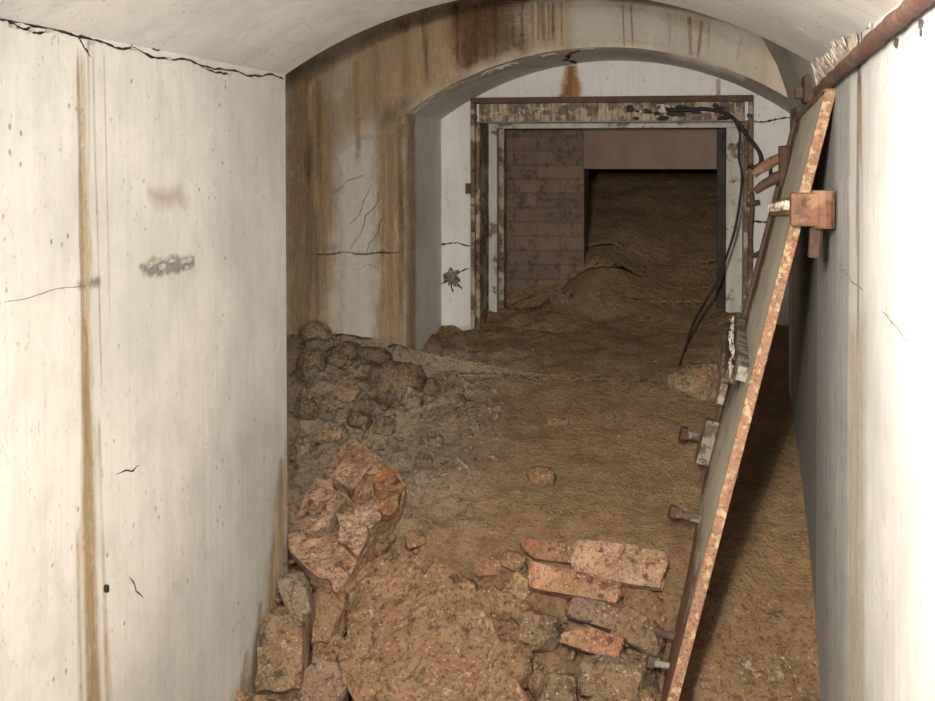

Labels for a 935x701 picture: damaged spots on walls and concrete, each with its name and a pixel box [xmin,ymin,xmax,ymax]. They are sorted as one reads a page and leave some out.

crack [0,18,284,80]
rust [452,0,563,68]
rust [562,66,580,97]
crack [304,174,402,270]
crack [6,283,94,302]
peeling [143,257,194,276]
leakage [77,158,108,701]